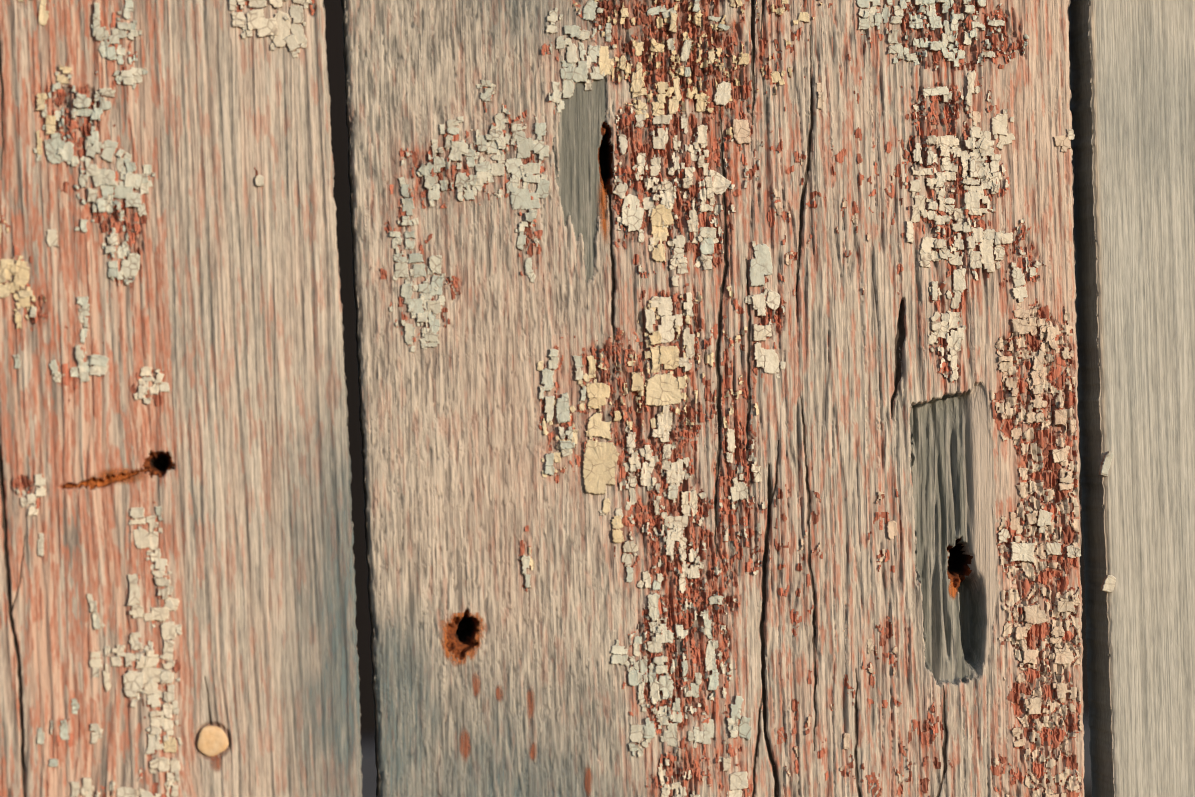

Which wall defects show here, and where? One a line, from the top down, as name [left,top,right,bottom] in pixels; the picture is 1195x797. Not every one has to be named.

crack [0,42,8,180]
peeling [33,0,155,288]
peeling [229,0,317,58]
crack [751,0,765,125]
rust [72,469,141,490]
peeling [379,0,833,797]
crack [714,105,817,797]
peeling [831,0,1082,797]
crack [0,451,26,797]
peeling [71,501,182,797]
rust [442,613,484,664]
rust [460,732,470,758]